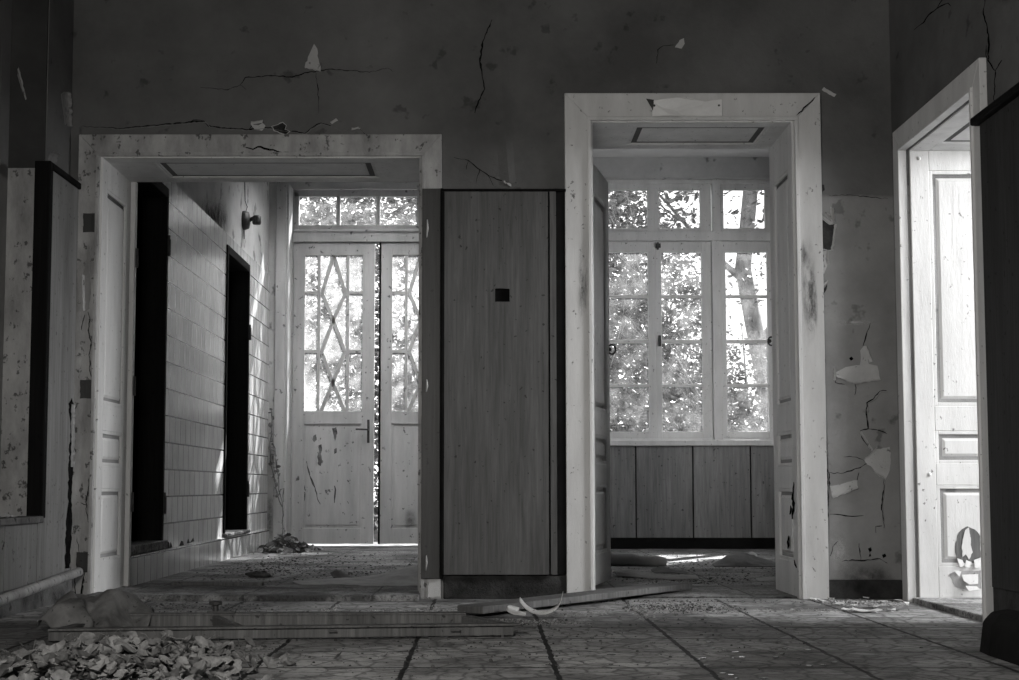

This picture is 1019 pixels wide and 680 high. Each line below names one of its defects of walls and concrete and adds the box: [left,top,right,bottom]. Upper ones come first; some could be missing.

peeling [825,346,881,385]
crack [825,358,887,563]
peeling [864,447,891,480]
peeling [830,480,858,498]